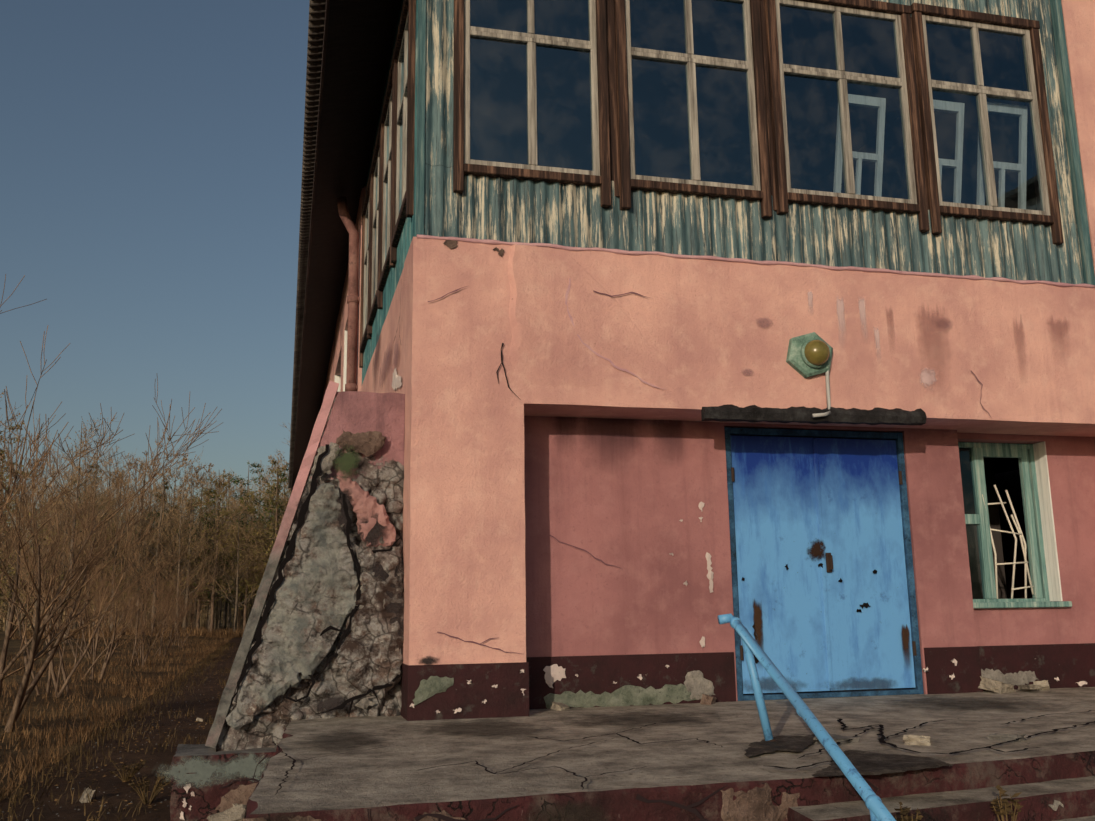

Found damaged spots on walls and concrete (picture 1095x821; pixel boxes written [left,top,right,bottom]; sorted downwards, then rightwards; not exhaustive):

crack [565,278,664,389]
crack [496,343,521,400]
crack [549,535,620,568]
corrosion [808,540,826,559]
spalling [225,430,404,730]
crack [437,632,522,654]
corrosion [753,600,763,648]
corrosion [902,625,910,660]
spalling [410,676,454,708]
spalling [543,664,715,709]
peeling [180,784,195,820]
spalling [215,783,267,821]